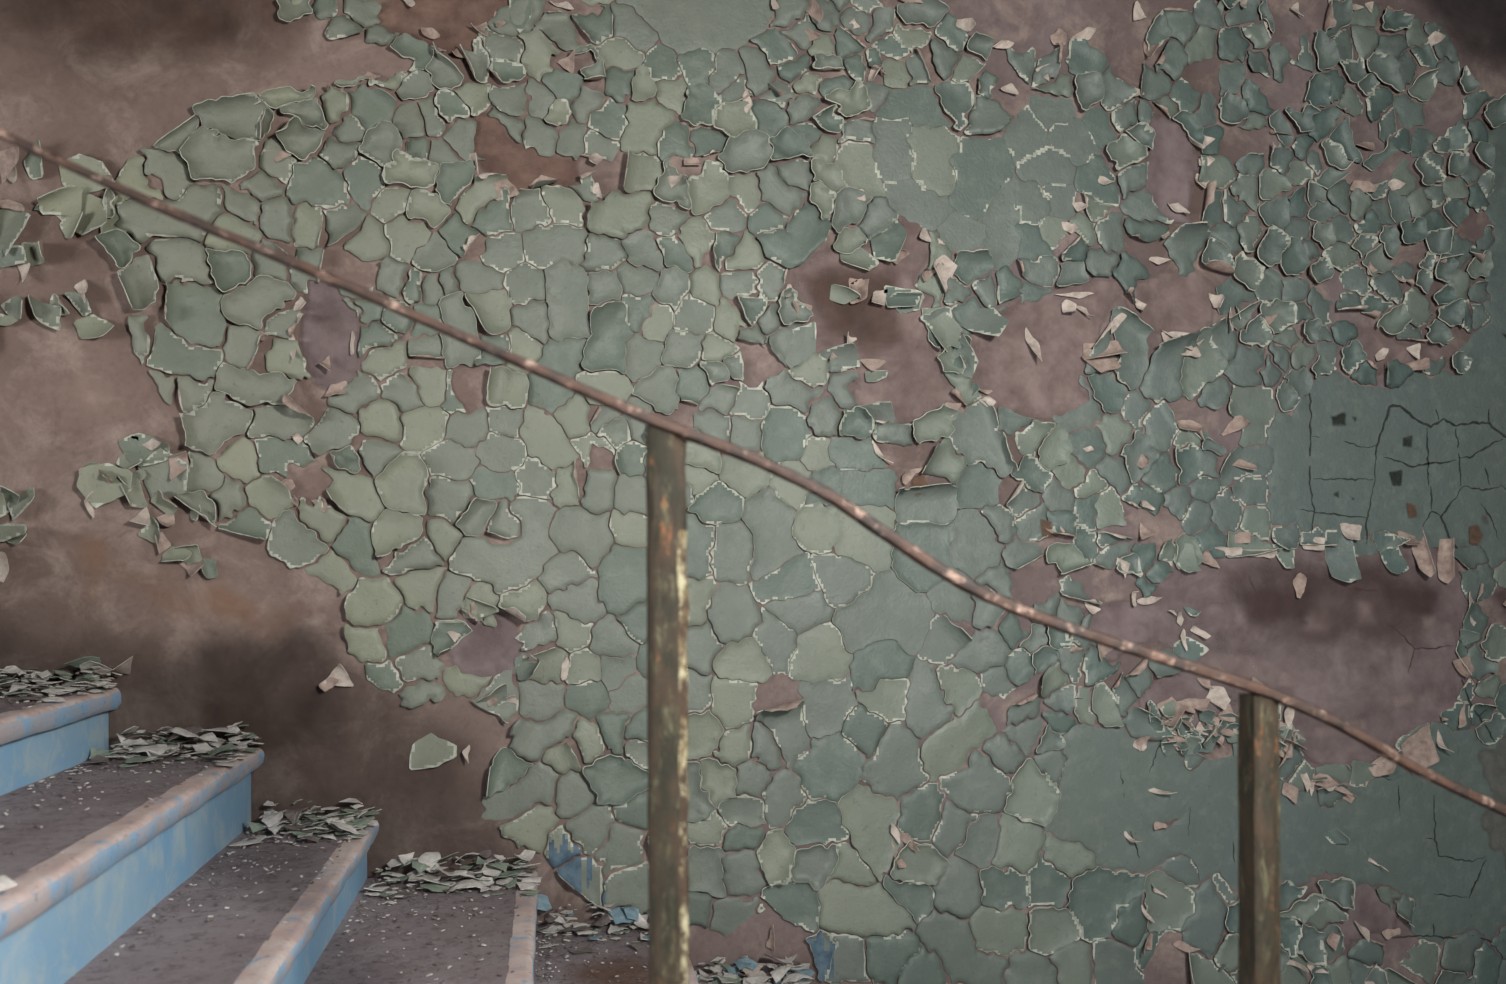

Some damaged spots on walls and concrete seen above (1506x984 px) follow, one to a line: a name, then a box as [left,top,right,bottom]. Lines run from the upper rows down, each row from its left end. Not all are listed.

peeling [0,139,44,184]
peeling [0,166,648,923]
peeling [67,0,1506,770]
water stain [1306,573,1391,611]
crack [1300,338,1506,549]
peeling [685,441,1249,984]
peeling [1279,704,1413,807]
peeling [1280,858,1506,984]